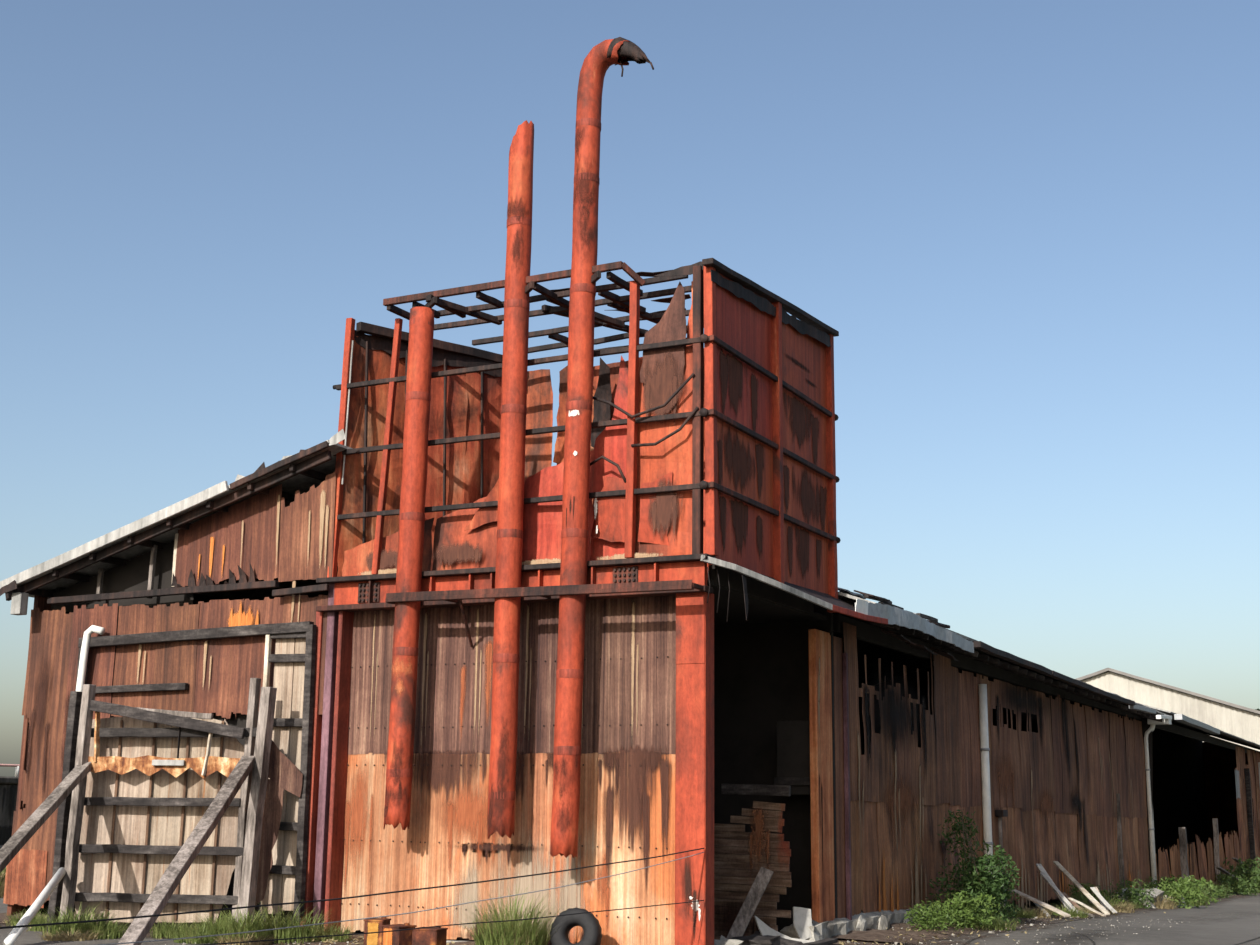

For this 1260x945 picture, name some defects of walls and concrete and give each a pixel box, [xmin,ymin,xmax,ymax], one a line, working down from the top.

peeling [643,353,684,423]
corrosion [394,661,410,693]
corrosion [88,755,241,779]
corrosion [344,774,373,885]
corrosion [412,750,534,867]
corrosion [597,745,671,925]